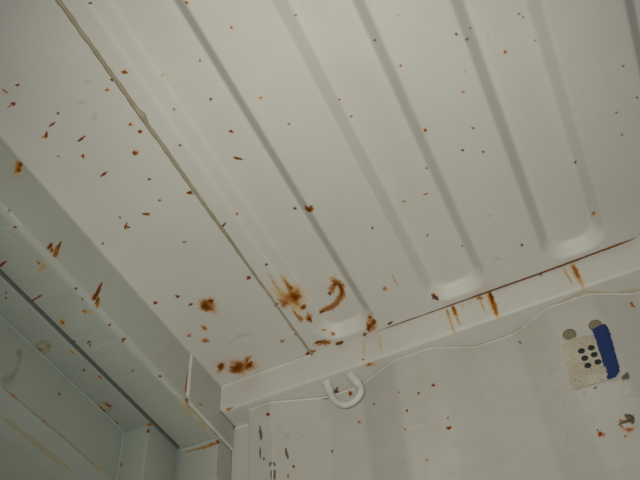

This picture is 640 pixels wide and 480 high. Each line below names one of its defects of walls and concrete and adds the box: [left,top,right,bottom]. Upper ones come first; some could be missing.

rust [201,299,215,312]
rust [274,281,312,323]
rust [319,279,345,313]
rust [363,240,631,336]
rust [305,329,344,355]
rust [218,357,254,373]